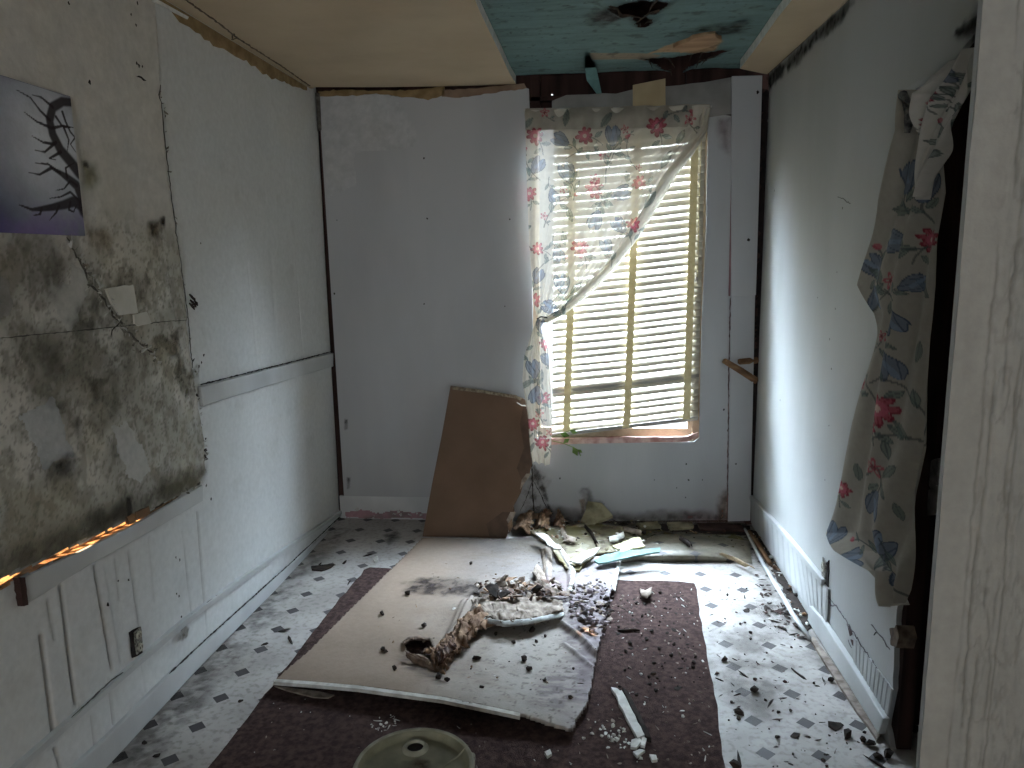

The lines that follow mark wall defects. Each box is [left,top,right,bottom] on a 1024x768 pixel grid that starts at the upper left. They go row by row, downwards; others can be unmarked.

leakage [767,0,849,90]
crack [2,85,332,385]
leakage [157,334,199,396]
leakage [2,498,132,568]